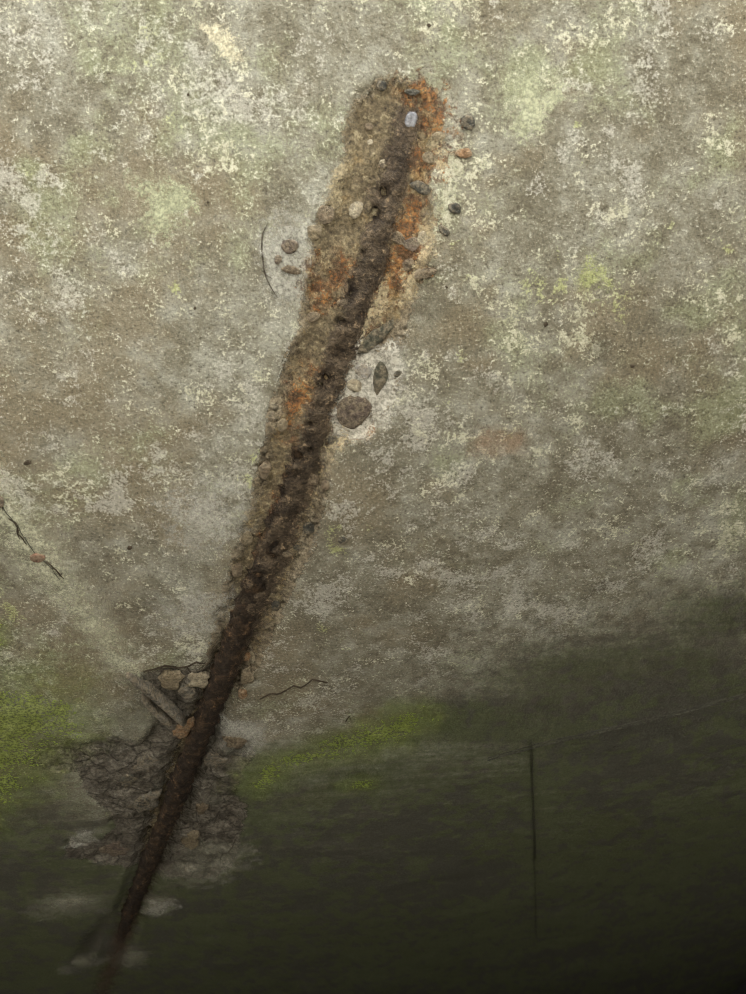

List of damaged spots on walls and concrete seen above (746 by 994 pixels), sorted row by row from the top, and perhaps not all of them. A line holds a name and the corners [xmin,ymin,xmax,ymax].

spalling [460,114,475,130]
rust [209,67,464,676]
spalling [34,76,472,880]
crack [0,495,64,580]
crack [260,679,328,700]